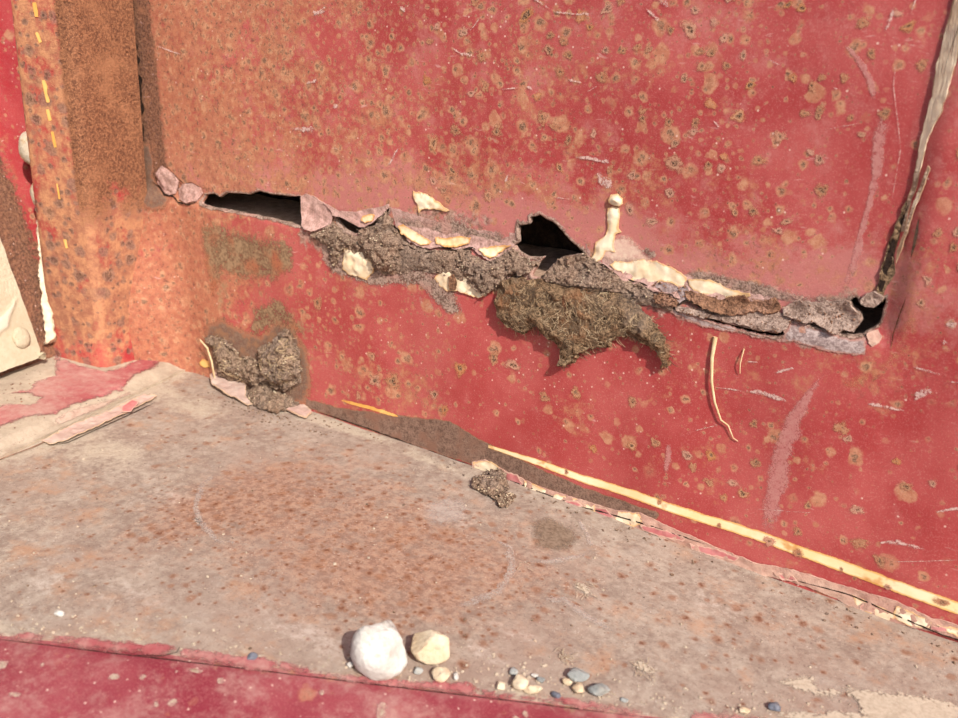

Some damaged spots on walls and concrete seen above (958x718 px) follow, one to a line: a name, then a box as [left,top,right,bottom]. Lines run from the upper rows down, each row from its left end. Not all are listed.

peeling [155,166,203,203]
peeling [413,191,449,213]
peeling [398,224,511,258]
peeling [342,248,374,280]
peeling [434,272,485,298]
peeling [860,291,884,308]
crack [876,200,919,349]
peeling [669,311,882,356]
peeling [0,355,158,444]
corrosion [203,318,662,519]